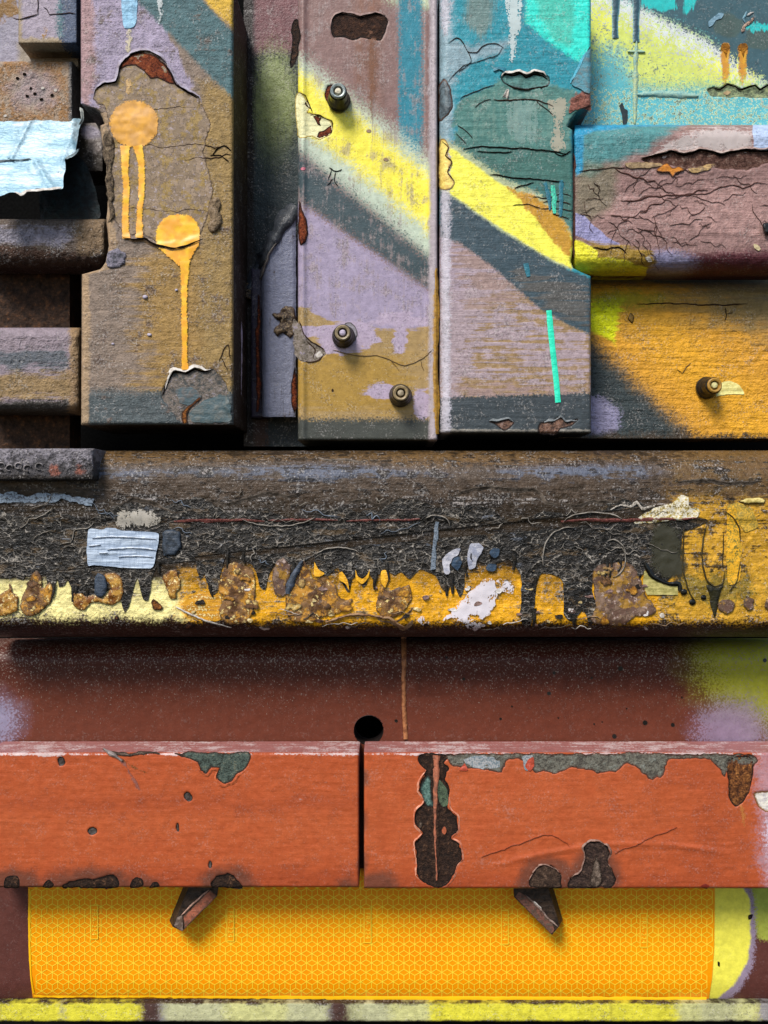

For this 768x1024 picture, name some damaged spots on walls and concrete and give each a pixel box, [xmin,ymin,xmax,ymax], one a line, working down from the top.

peeling [93,48,231,251]
crack [210,145,231,162]
crack [449,37,768,270]
peeling [625,129,768,177]
peeling [162,364,232,425]
peeling [0,478,765,634]
peeling [43,874,160,889]
peeling [174,751,251,788]
peeling [208,861,243,889]
crack [482,834,570,857]
peeling [413,751,758,889]
corrosion [726,756,753,823]